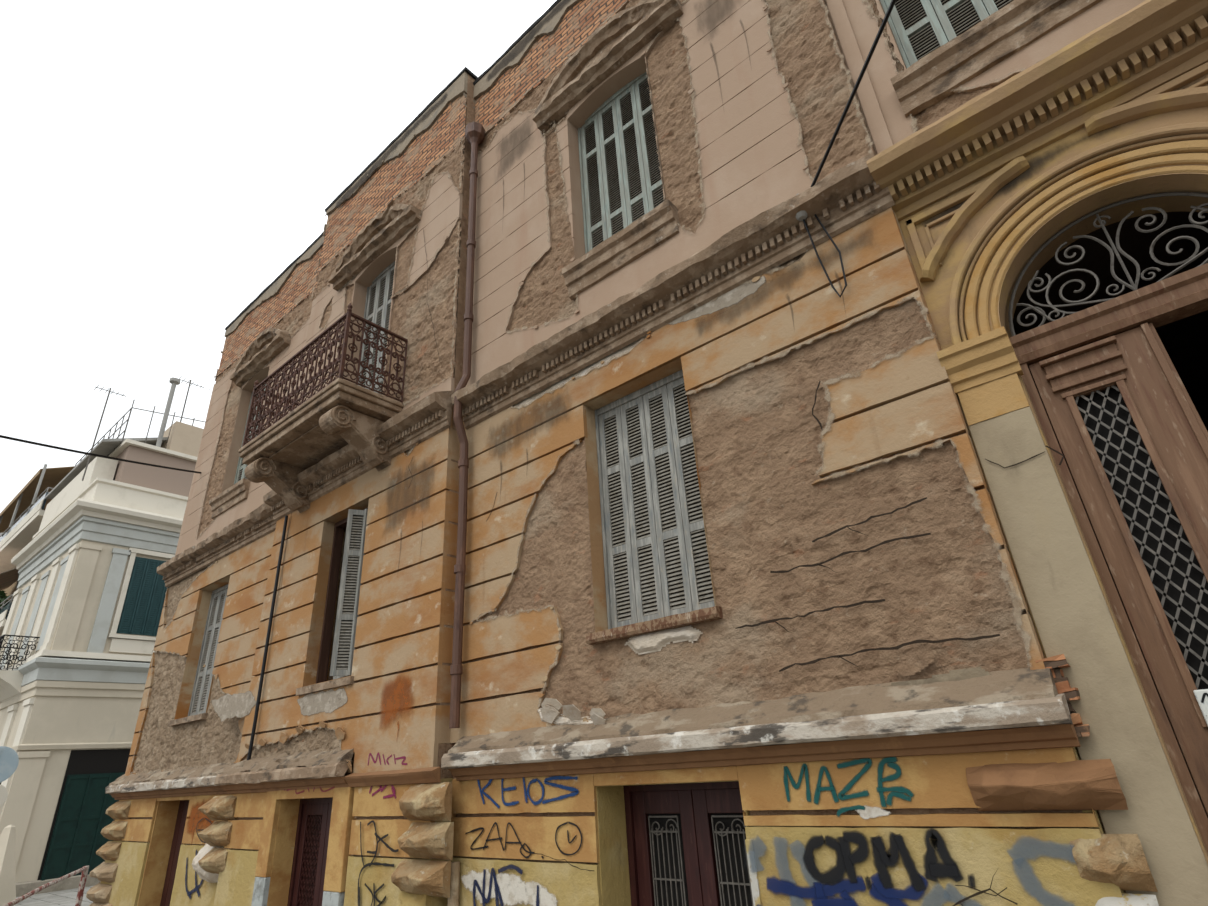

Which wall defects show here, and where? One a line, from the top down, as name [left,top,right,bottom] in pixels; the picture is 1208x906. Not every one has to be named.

spalling [640,0,705,233]
spalling [762,0,873,182]
spalling [863,0,904,74]
spalling [910,62,1038,132]
spalling [196,0,641,540]
peeling [668,250,808,325]
spalling [470,296,1090,737]
spalling [129,650,353,775]
rust [381,677,411,737]